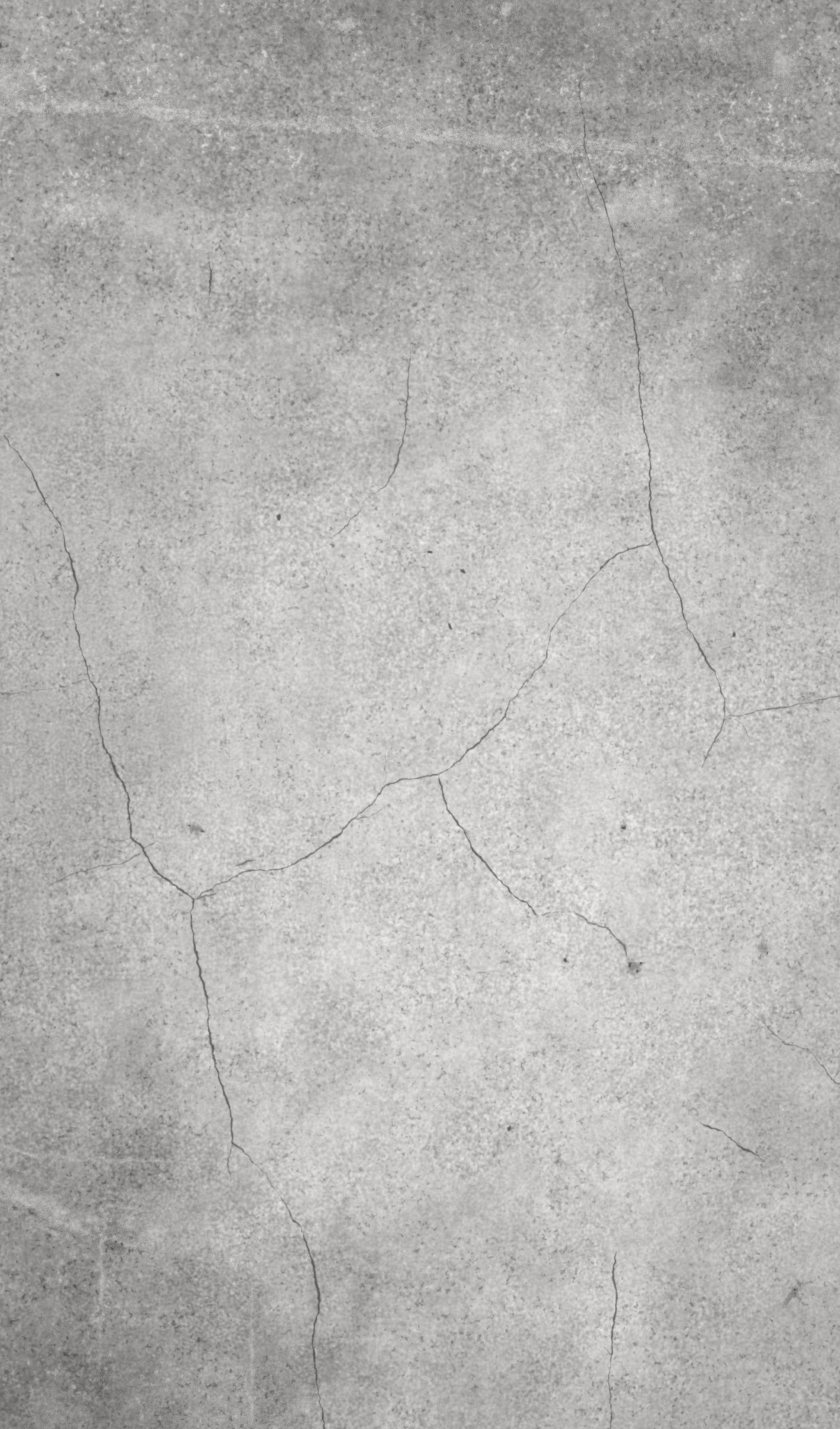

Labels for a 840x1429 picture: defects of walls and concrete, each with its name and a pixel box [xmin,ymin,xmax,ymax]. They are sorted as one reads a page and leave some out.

crack [579,96,725,759]
crack [7,439,535,1160]
crack [290,1214,325,1429]
crack [608,1254,617,1419]